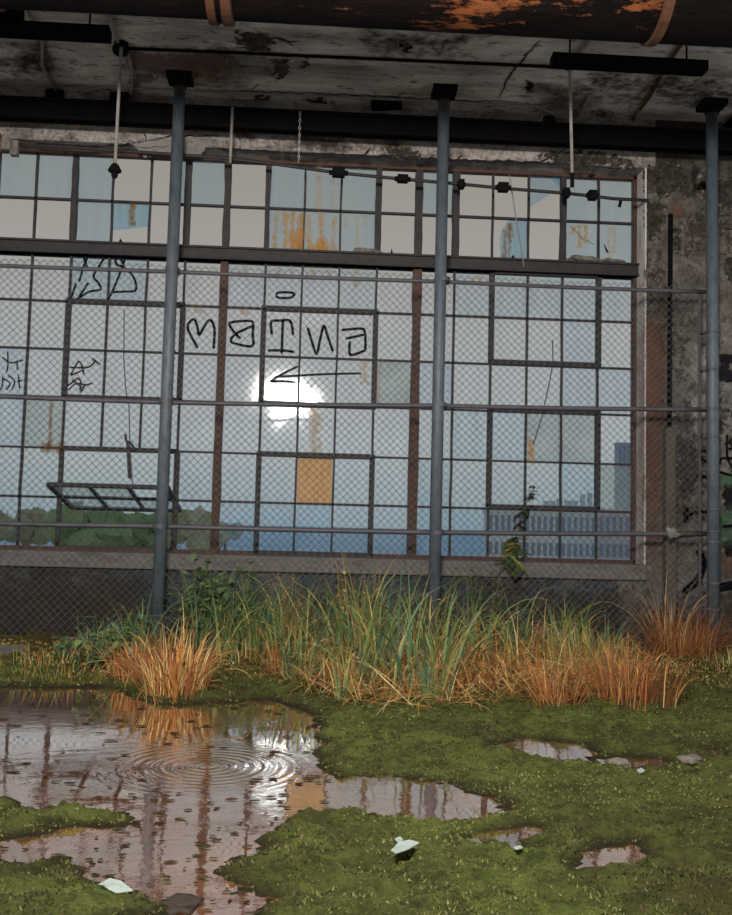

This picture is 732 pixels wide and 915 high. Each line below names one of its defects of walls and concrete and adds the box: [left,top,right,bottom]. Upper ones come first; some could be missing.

leakage [363,29,469,56]
crack [208,84,429,99]
crack [455,41,540,103]
corrosion [273,167,338,251]
peeling [537,149,706,252]
peeling [718,166,732,208]
peeling [724,256,732,288]